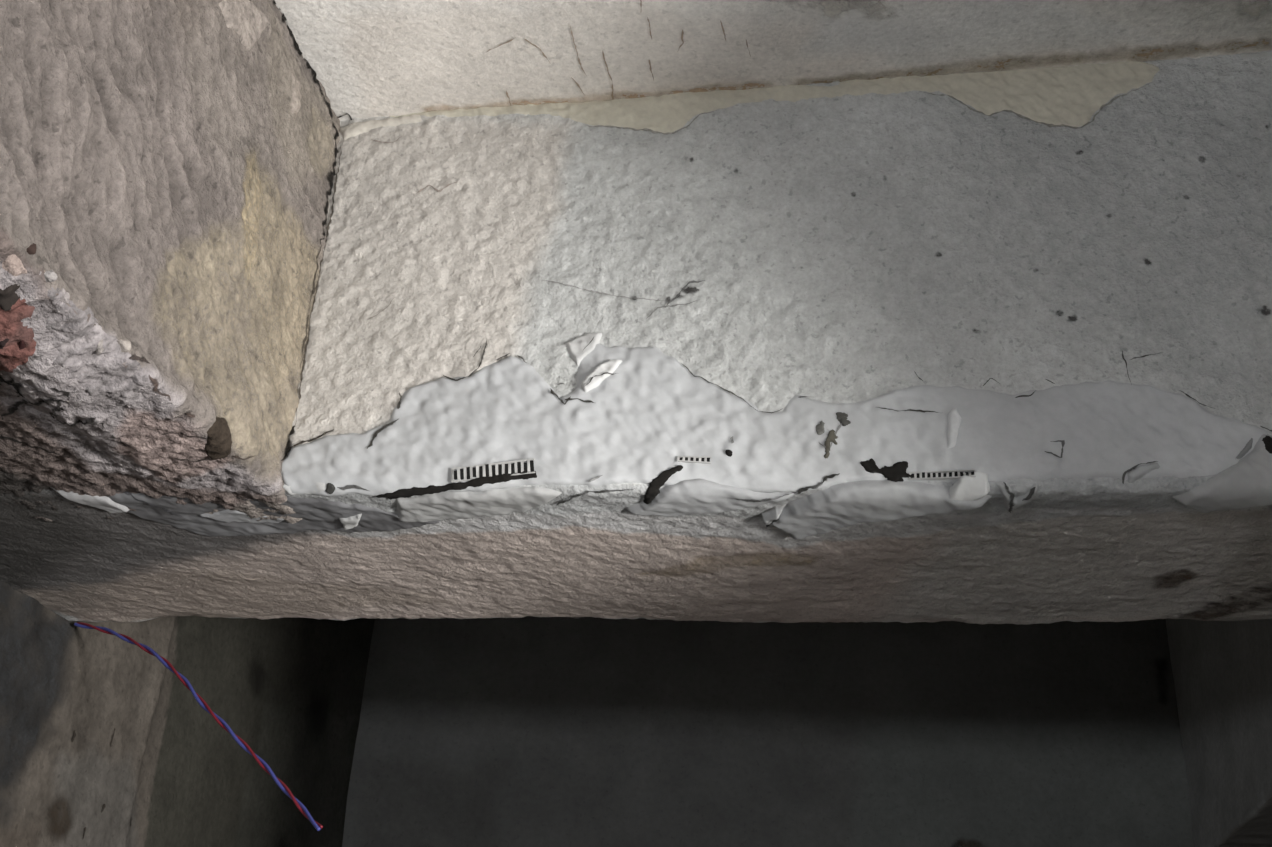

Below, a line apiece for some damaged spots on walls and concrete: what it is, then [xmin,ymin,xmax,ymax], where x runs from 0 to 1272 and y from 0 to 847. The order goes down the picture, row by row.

peeling [339,60,1159,140]
spalling [0,243,171,416]
peeling [949,471,990,501]
peeling [396,486,561,522]
peeling [762,504,786,525]
leakage [1157,570,1196,588]
leakage [1182,588,1272,620]